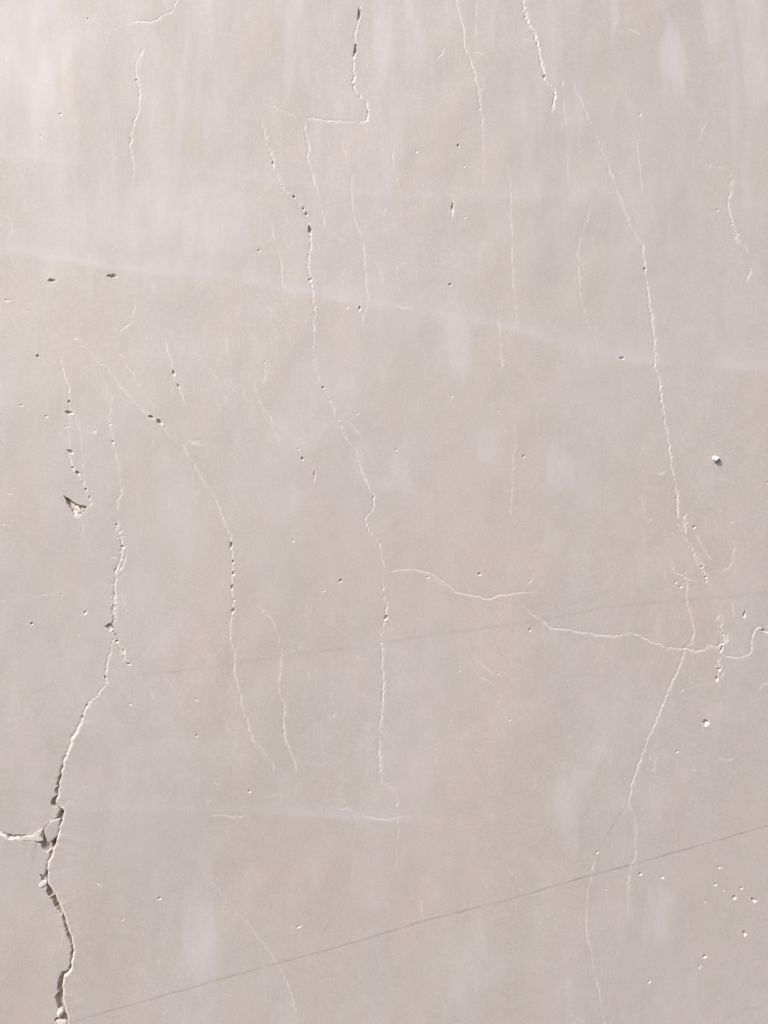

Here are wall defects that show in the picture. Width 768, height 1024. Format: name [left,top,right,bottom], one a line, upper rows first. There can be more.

spalling [62,494,89,541]
crack [0,326,300,1024]
crack [259,0,768,916]